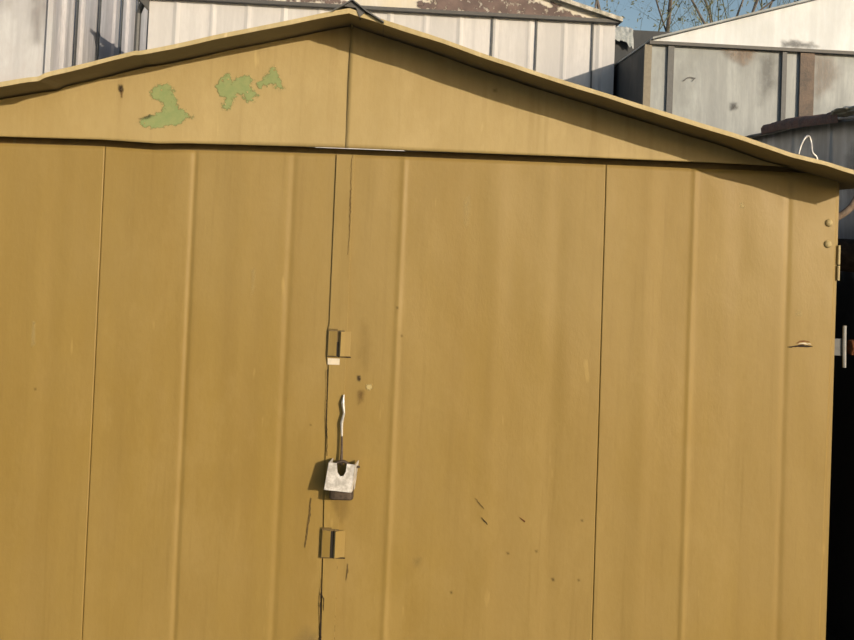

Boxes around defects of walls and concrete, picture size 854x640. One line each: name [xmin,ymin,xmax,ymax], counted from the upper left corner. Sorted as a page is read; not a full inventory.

peeling [417,0,586,18]
peeling [140,84,191,129]
peeling [215,67,284,110]